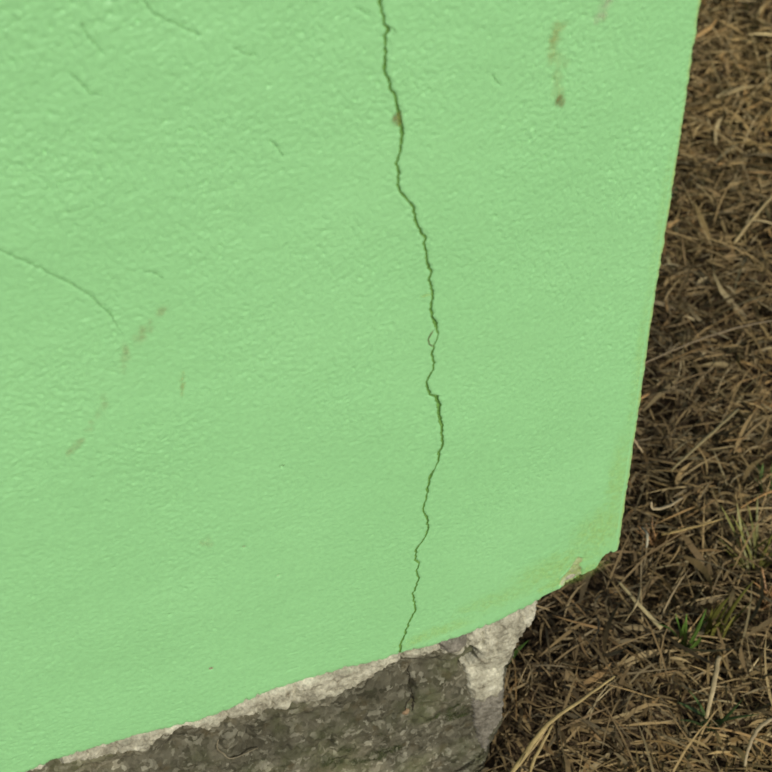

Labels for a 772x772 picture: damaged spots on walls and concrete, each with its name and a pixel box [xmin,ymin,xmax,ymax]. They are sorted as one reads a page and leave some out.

spalling [59,600,538,764]
crack [377,0,444,711]